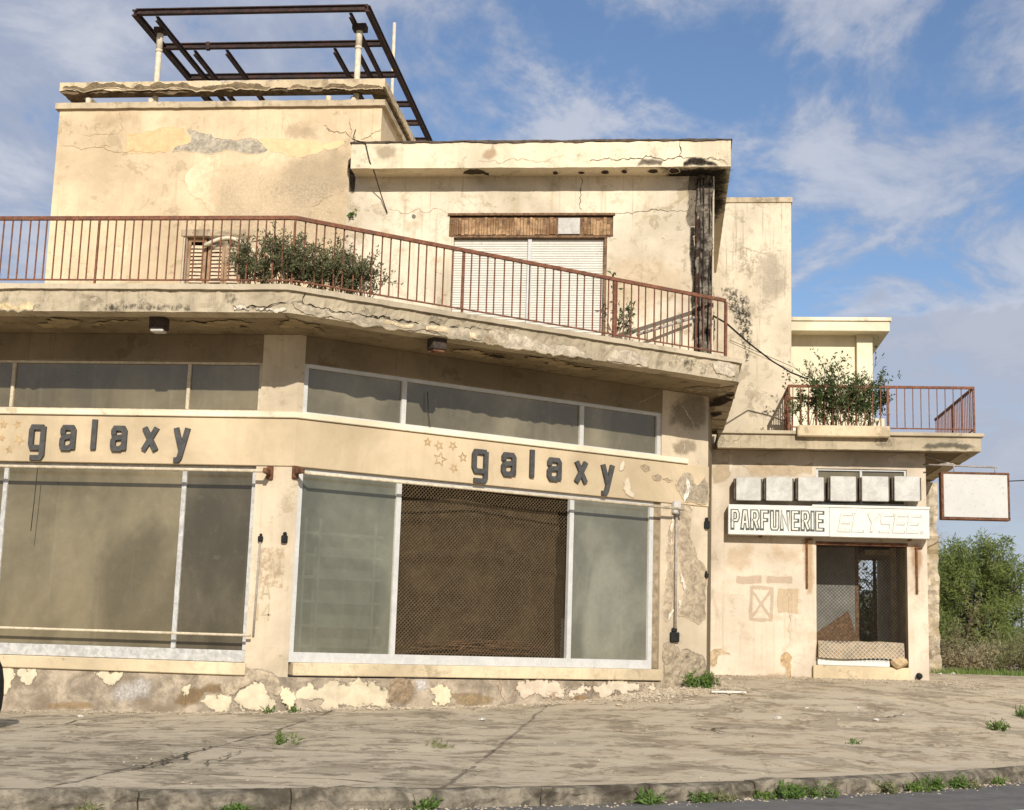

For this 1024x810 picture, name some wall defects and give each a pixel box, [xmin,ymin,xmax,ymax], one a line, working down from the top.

spalling [62,81,271,93]
spalling [287,83,383,91]
spalling [125,126,348,214]
crack [479,140,728,209]
peeling [0,301,34,312]
spalling [233,302,594,361]
peeling [607,348,649,367]
spalling [640,454,814,625]
peeling [3,667,38,695]
peeling [94,671,124,686]
peeling [181,667,414,712]
peeling [428,683,453,707]